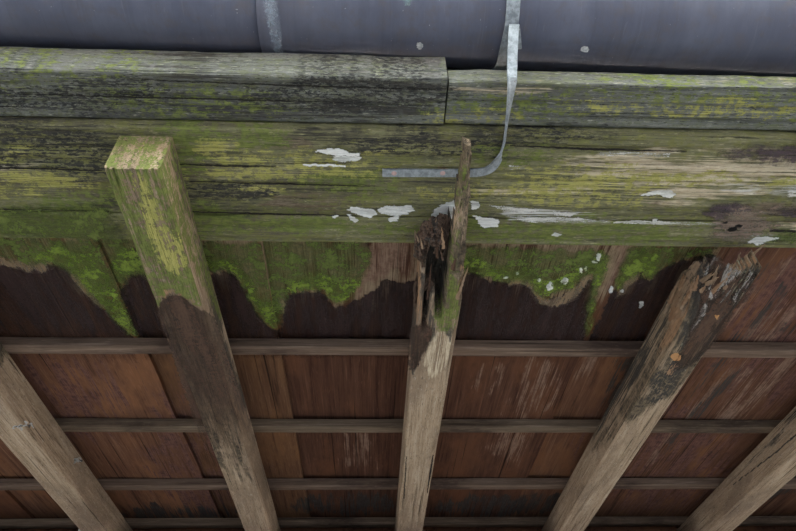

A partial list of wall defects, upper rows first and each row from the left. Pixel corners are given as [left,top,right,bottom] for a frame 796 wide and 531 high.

peeling [303,148,362,167]
damp [721,145,796,166]
peeling [642,190,676,198]
peeling [332,205,415,223]
peeling [431,200,455,219]
peeling [470,201,593,228]
damp [455,254,758,368]
damp [0,257,432,431]
crack [733,435,796,485]